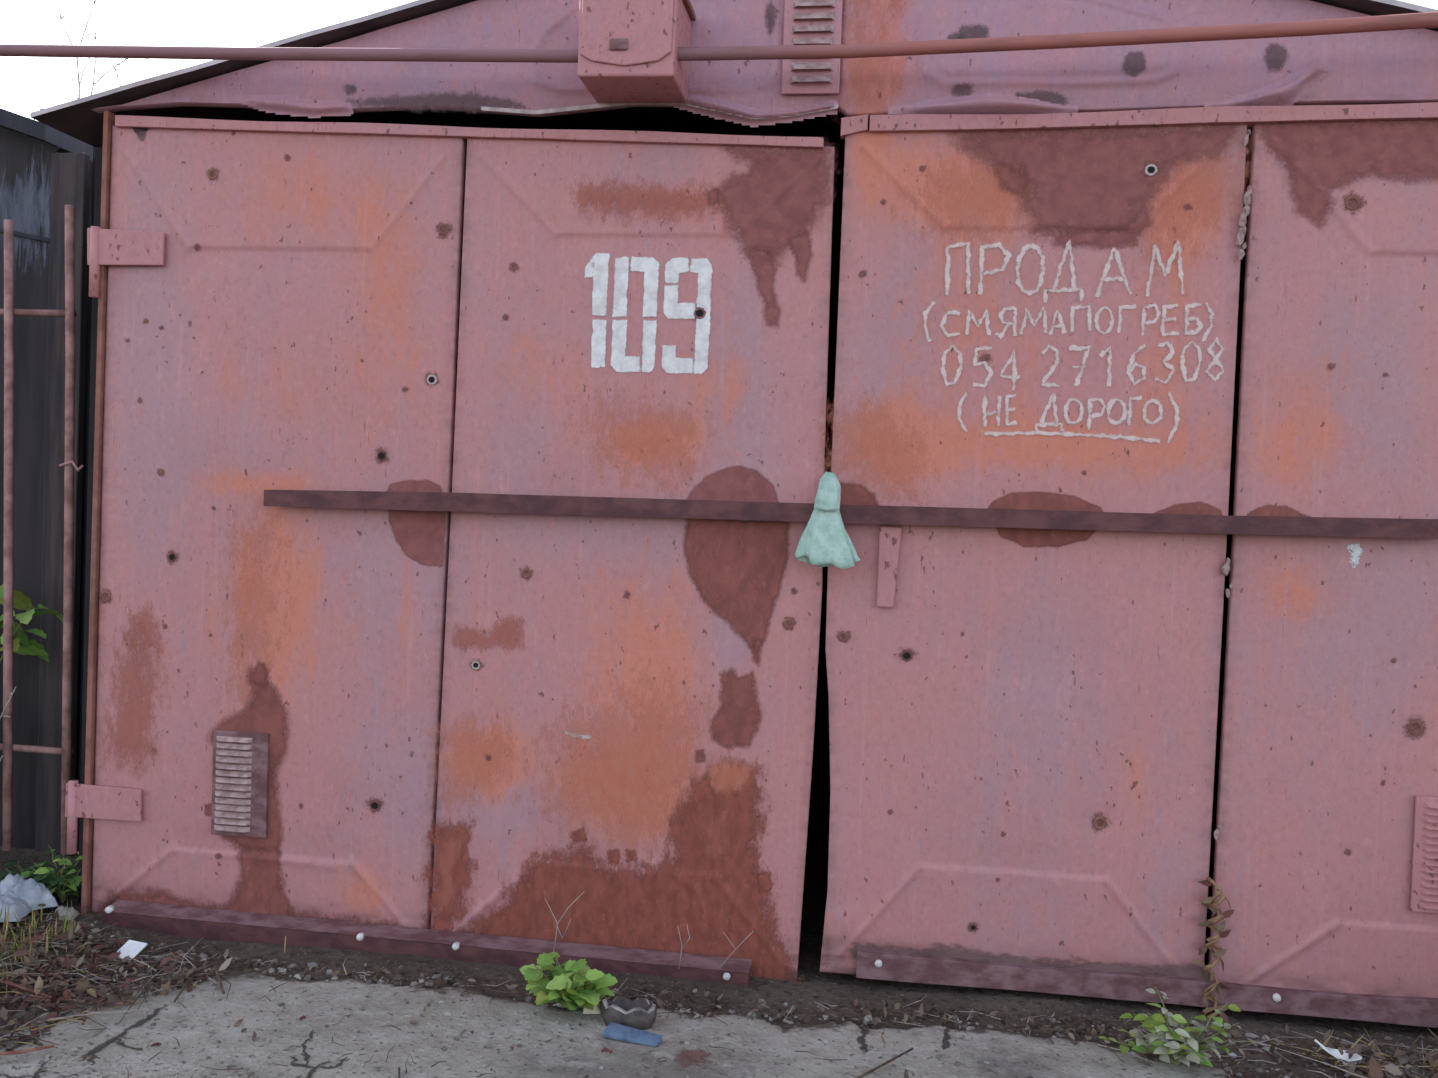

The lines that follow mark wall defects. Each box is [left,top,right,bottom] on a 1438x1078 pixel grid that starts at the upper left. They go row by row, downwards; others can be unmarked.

corrosion [961,124,1236,249]
corrosion [1260,120,1438,227]
corrosion [708,146,831,325]
corrosion [388,480,442,492]
corrosion [687,466,778,502]
corrosion [988,492,1103,512]
corrosion [389,510,446,567]
corrosion [997,527,1096,547]
corrosion [423,518,798,982]
corrosion [213,662,291,916]
crack [290,1030,348,1078]